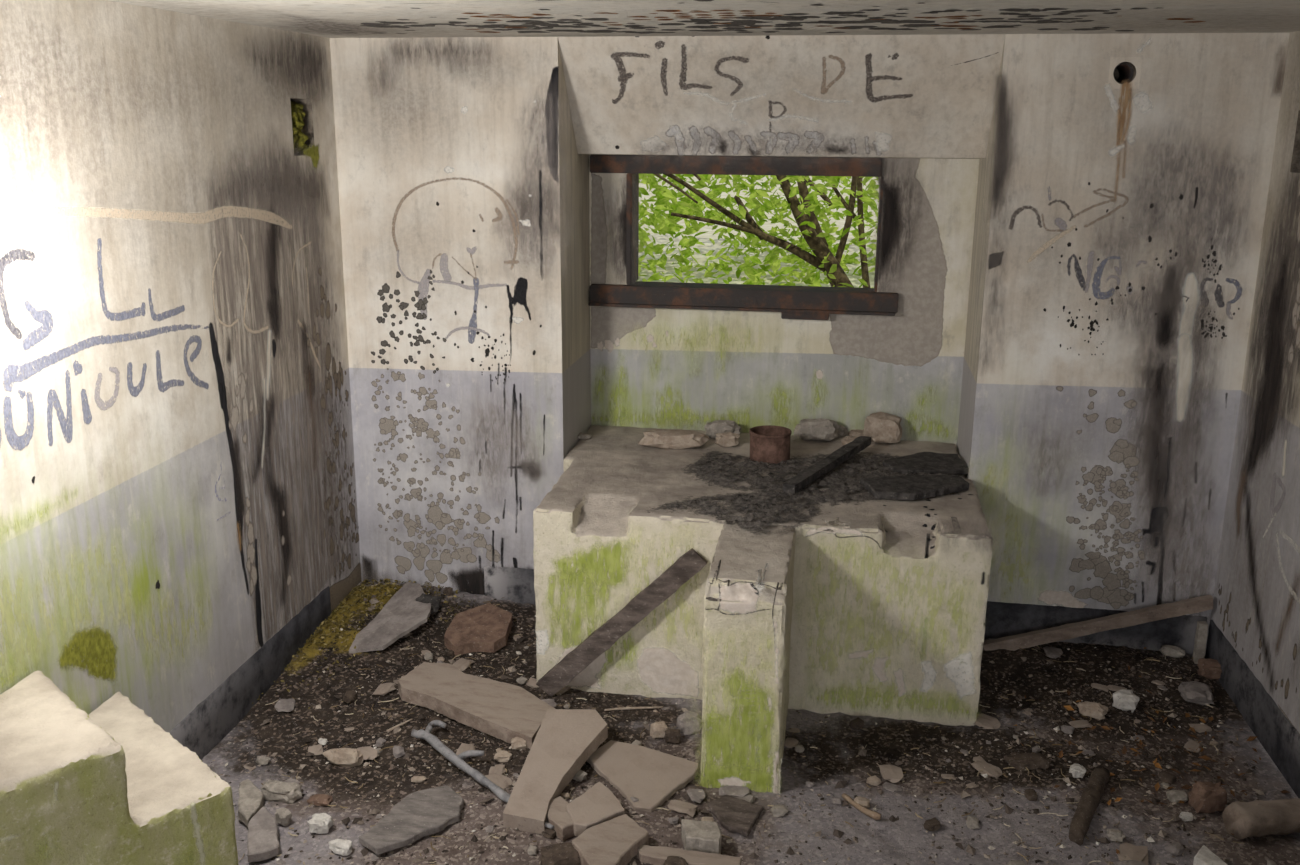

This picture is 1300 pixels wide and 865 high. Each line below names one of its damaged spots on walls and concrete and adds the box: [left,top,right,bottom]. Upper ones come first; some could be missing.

peeling [341,3,1147,34]
corrosion [1115,82,1131,200]
water stain [209,207,291,647]
water stain [298,320,321,467]
peeling [371,270,500,586]
peeling [1038,389,1145,609]
water stain [1134,268,1199,605]
water stain [1236,259,1298,689]